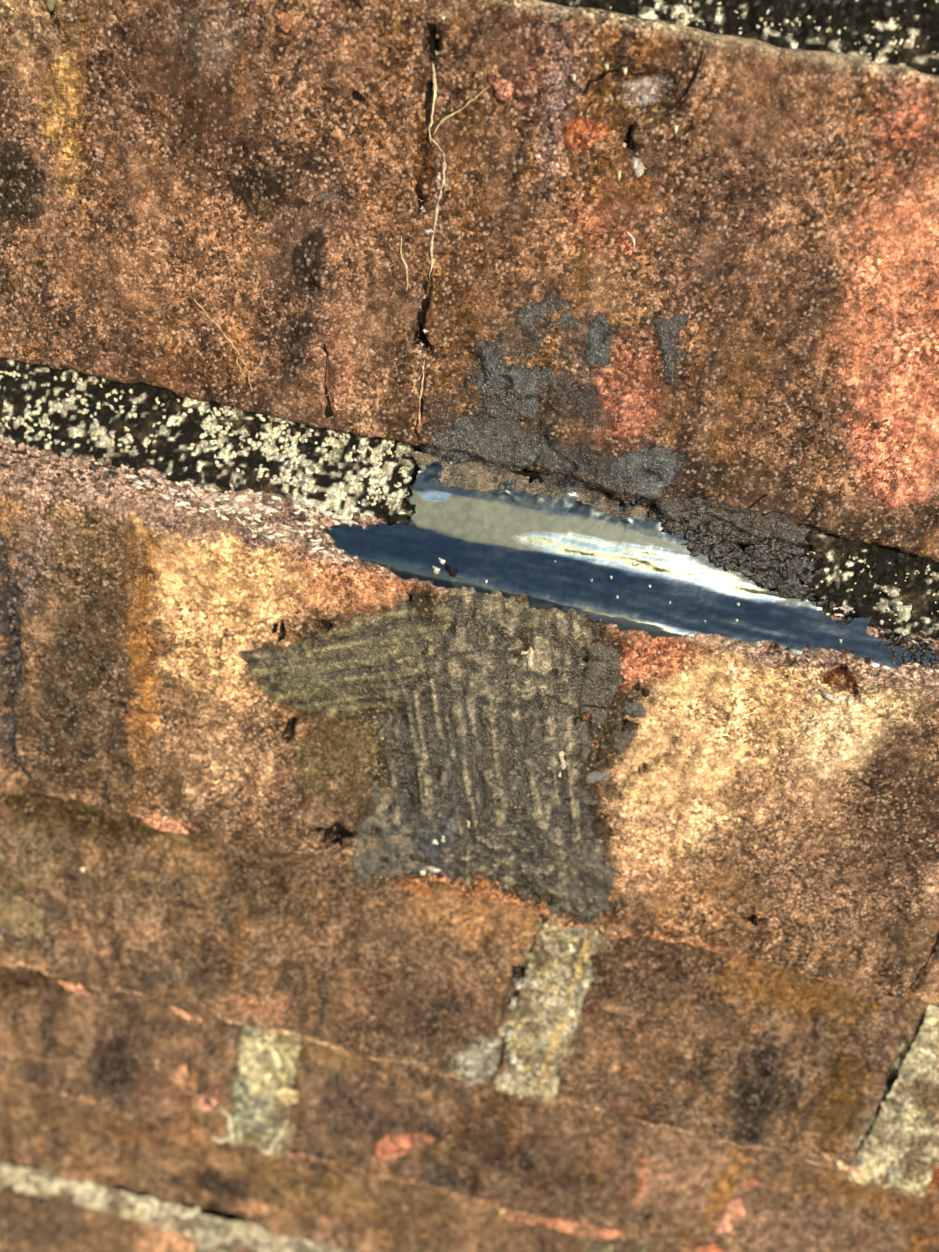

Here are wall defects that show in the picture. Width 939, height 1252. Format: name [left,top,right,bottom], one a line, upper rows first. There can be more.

crack [400,14,491,451]
crack [468,458,655,503]
crack [0,535,31,779]
crack [909,932,939,987]